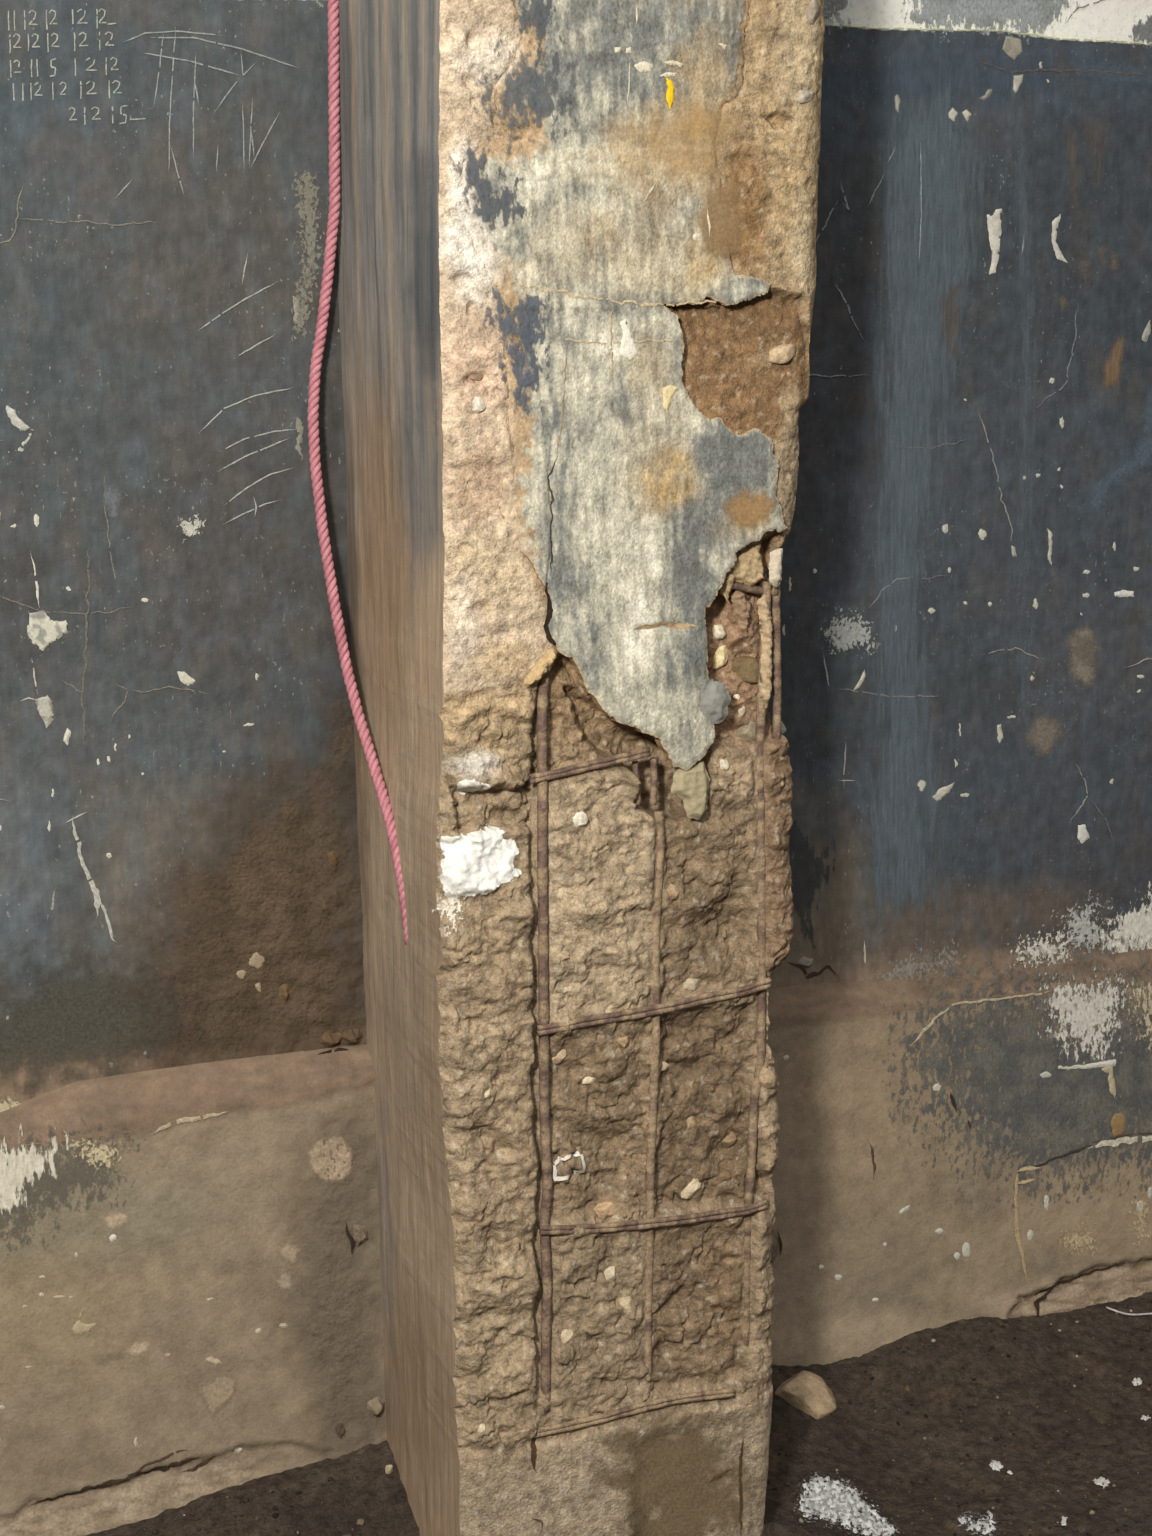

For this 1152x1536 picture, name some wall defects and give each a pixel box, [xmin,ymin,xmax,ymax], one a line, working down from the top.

peeling [901,0,1080,94]
crack [977,0,1143,75]
crack [0,182,157,244]
peeling [987,209,1002,275]
peeling [1051,214,1067,262]
spalling [435,0,851,1458]
peeling [1077,824,1090,844]
damp [1010,881,1152,968]
peeling [882,935,1152,1209]
spalling [1008,1257,1152,1318]
crack [26,1450,218,1507]
damp [604,1413,754,1536]